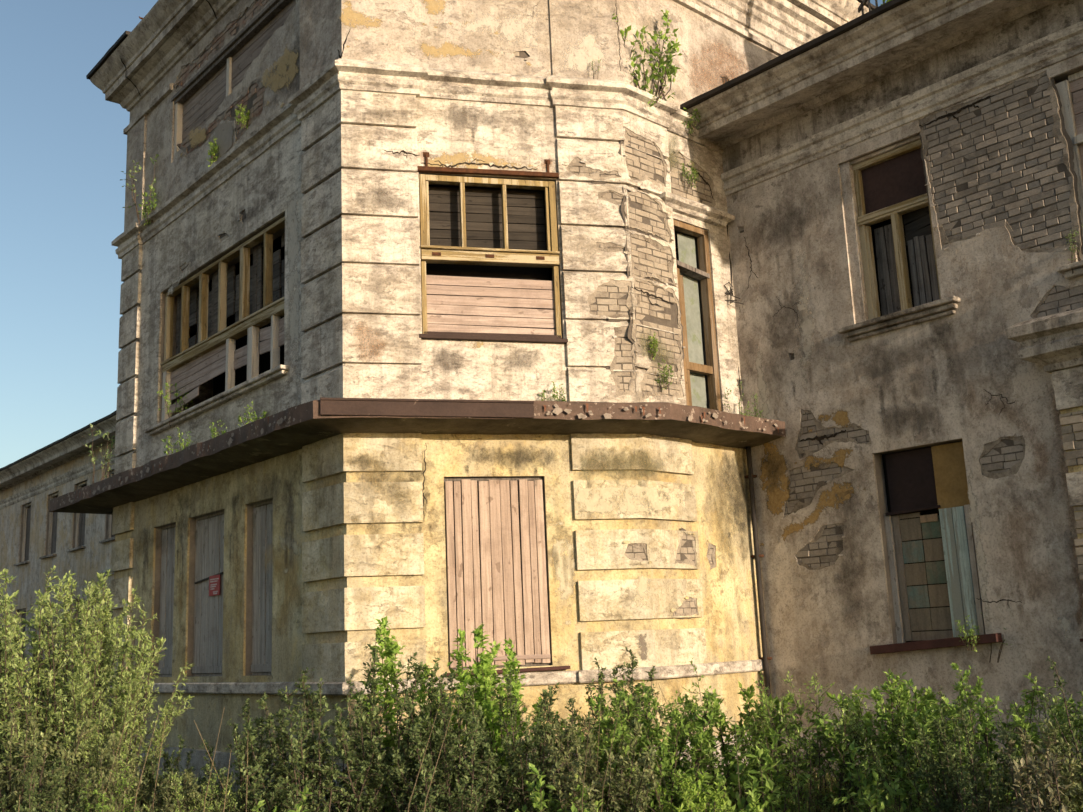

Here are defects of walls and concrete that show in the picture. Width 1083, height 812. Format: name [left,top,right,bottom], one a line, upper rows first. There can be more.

peeling [341,1,381,28]
spalling [177,45,299,157]
peeling [428,147,540,169]
spalling [919,70,1083,254]
spalling [544,128,715,419]
water stain [483,450,552,472]
spalling [623,540,652,564]
spalling [675,527,716,570]
water stain [724,461,748,535]
spalling [688,409,872,573]
spalling [968,433,1025,620]
spalling [671,596,698,619]